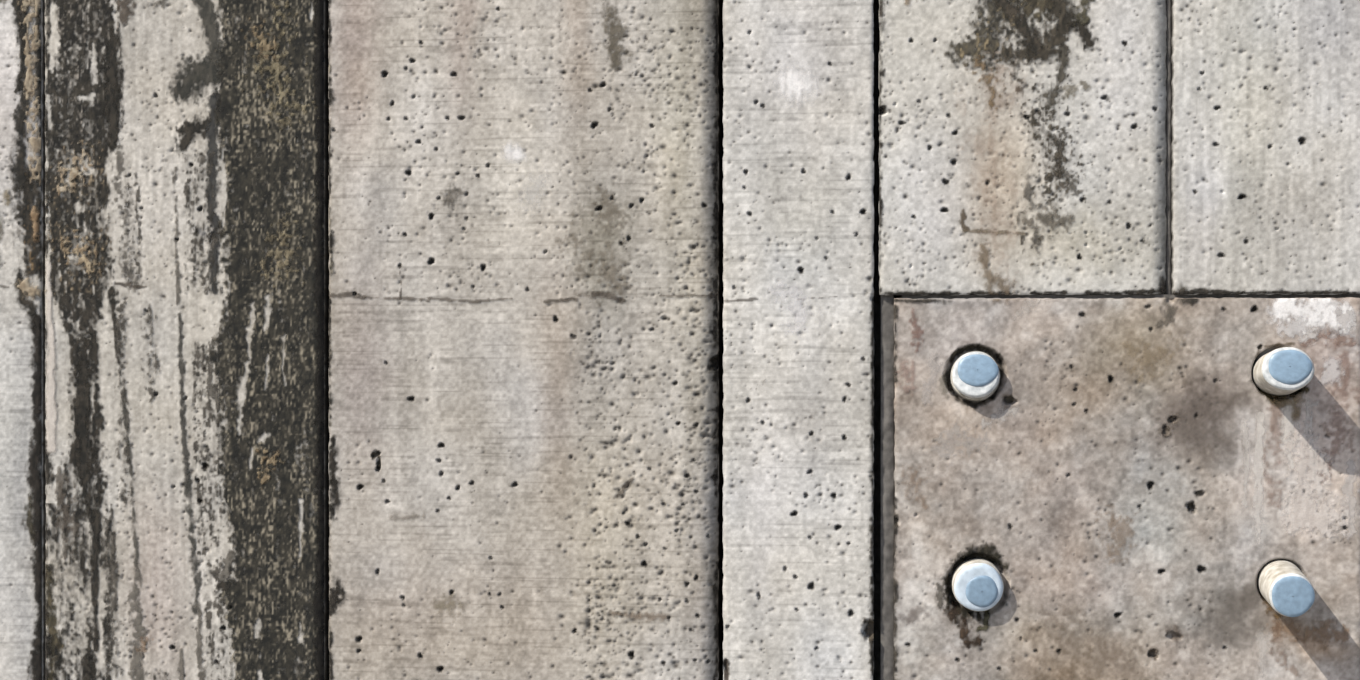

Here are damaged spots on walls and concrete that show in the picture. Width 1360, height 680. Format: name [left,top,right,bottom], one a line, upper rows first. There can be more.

leakage [1024,175,1033,206]
leakage [960,209,1040,250]
leakage [0,0,345,680]